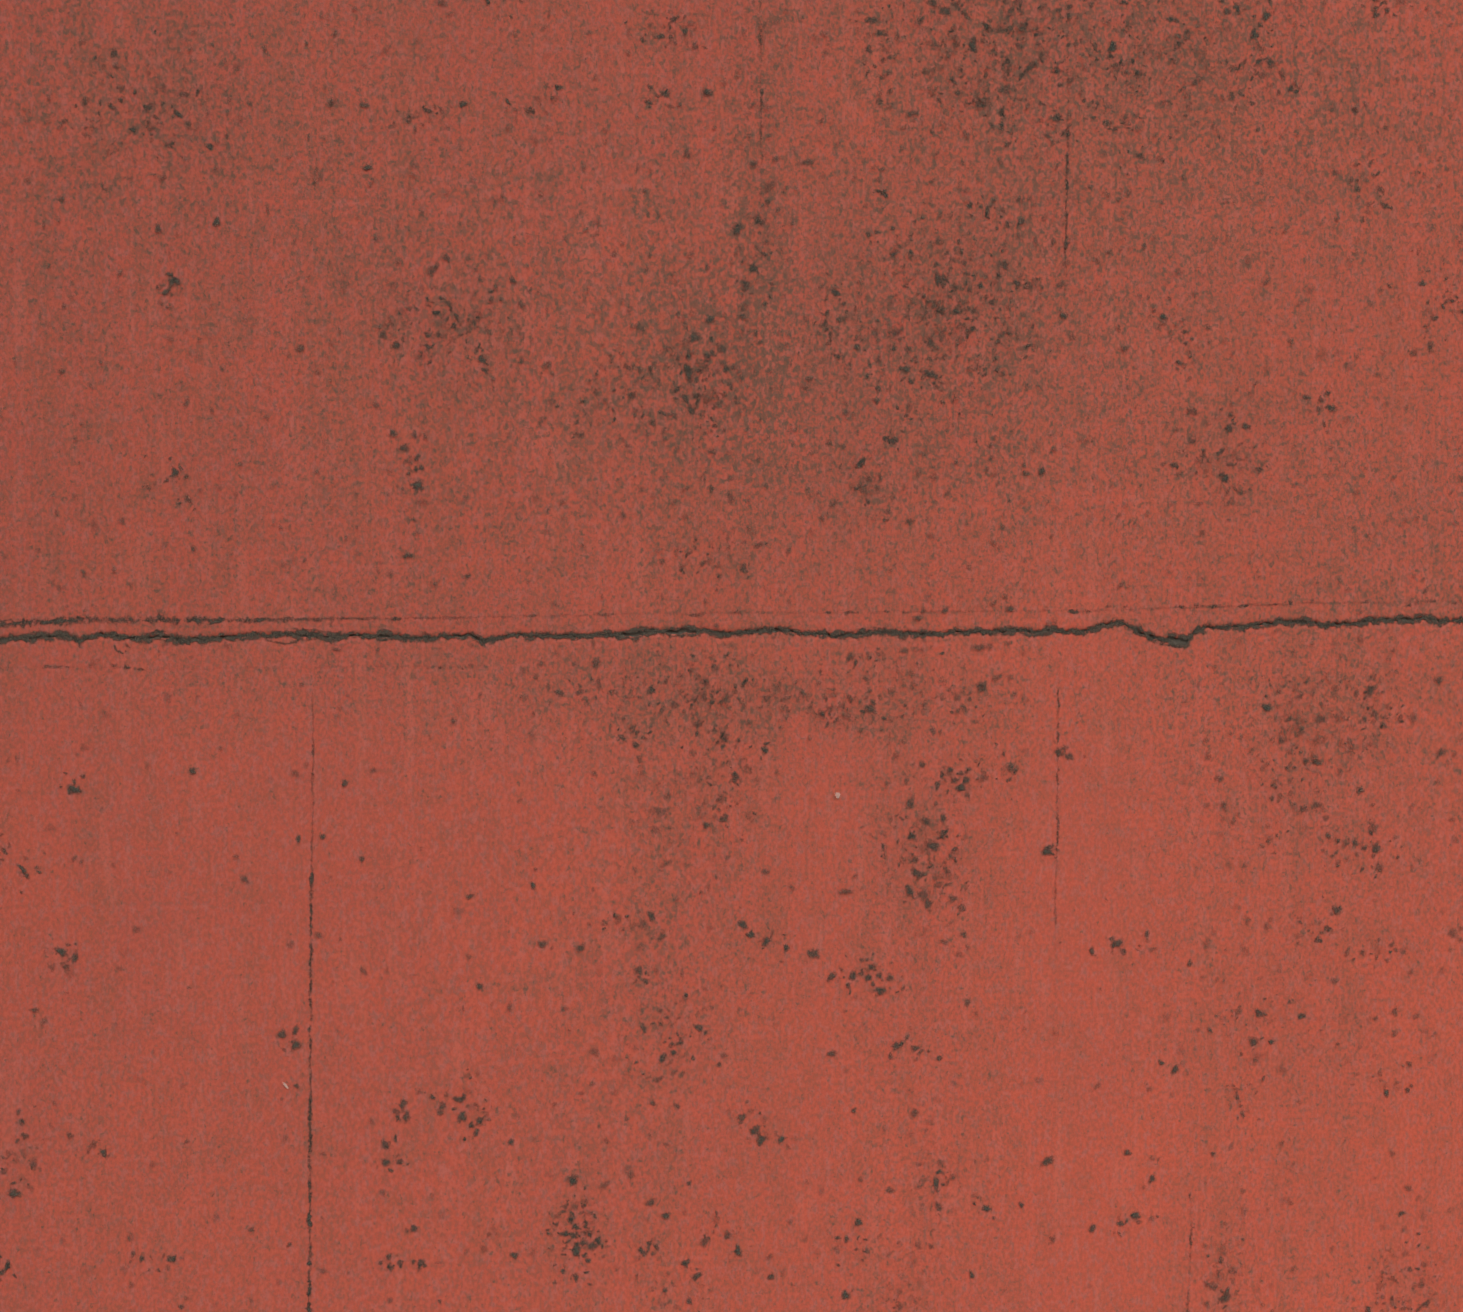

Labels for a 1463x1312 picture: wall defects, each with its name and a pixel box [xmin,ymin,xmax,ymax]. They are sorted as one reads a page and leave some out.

crack [0,601,1463,670]